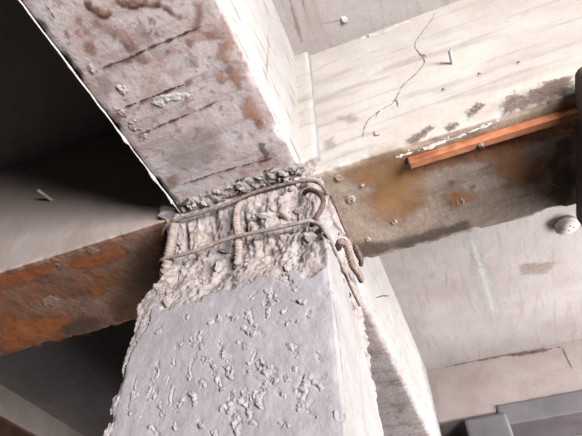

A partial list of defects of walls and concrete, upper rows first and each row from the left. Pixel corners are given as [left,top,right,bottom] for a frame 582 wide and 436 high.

crack [104,26,201,68]
rust [217,42,242,88]
crack [362,14,434,137]
crack [118,82,194,110]
crack [140,102,215,134]
rust [245,98,264,128]
water stain [408,126,434,142]
water stain [502,77,572,113]
rust [353,120,576,218]
spalling [18,0,377,399]
rust [0,264,55,287]
rust [1,314,69,352]